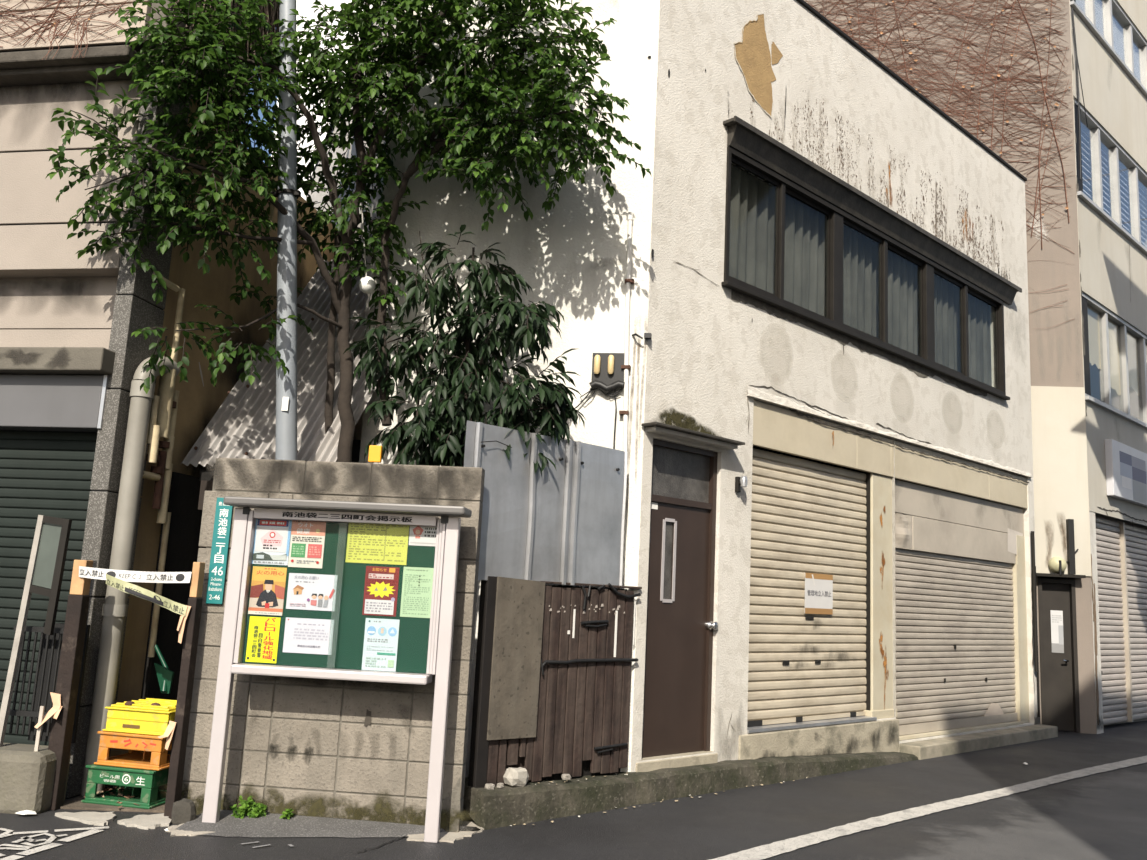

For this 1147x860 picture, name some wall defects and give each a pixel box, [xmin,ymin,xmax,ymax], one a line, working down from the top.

peeling [734,13,1010,280]
corrosion [879,634,889,705]